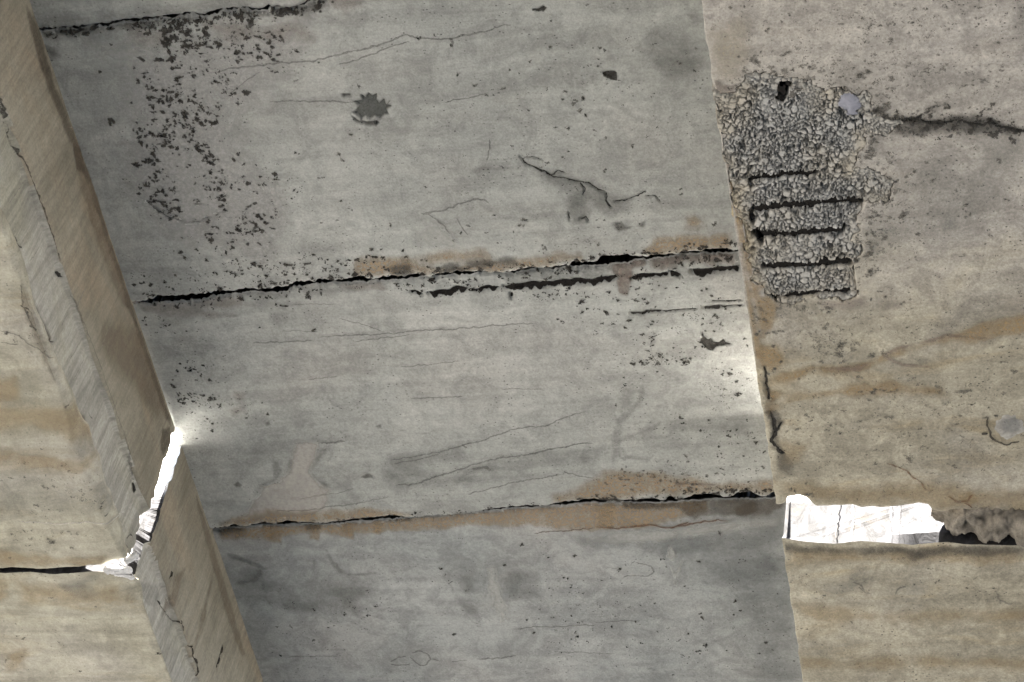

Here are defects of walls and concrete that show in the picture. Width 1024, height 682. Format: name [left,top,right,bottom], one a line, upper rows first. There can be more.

crack [901,115,1023,132]
crack [522,156,660,221]
spalling [716,0,1024,329]
spalling [46,0,905,503]
crack [411,265,741,314]
crack [764,367,785,454]
corrosion [220,473,782,542]
crack [535,519,725,534]